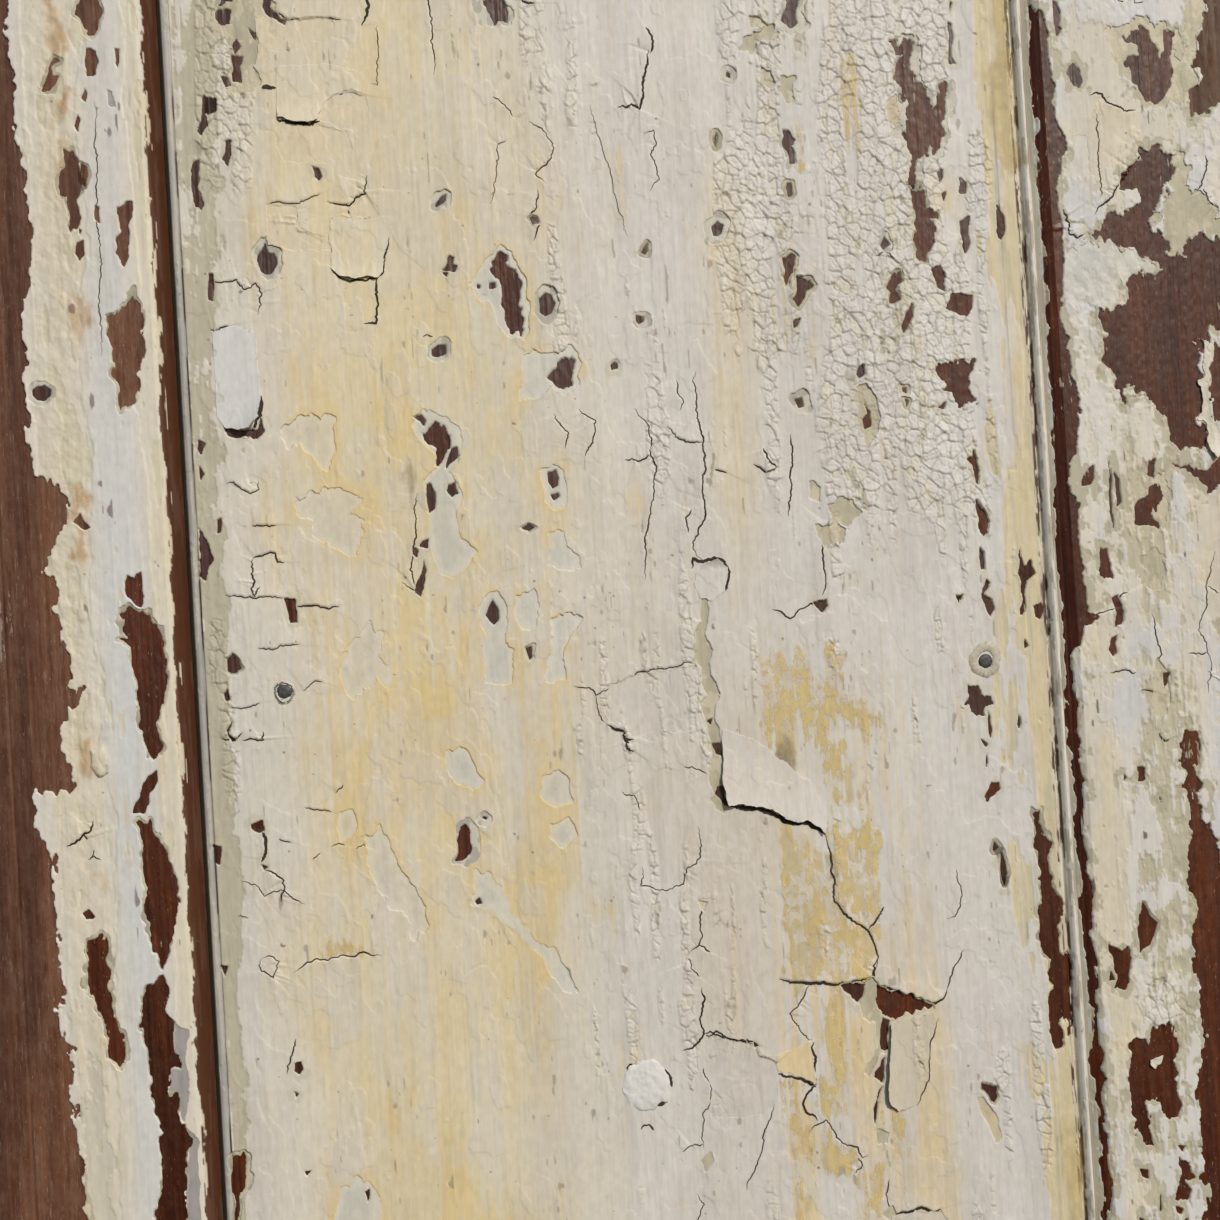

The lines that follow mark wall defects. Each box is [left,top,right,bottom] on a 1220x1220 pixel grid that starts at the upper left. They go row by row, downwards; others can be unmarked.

crack [590,28,660,232]
peeling [887,3,973,317]
peeling [469,245,582,401]
peeling [0,0,201,1220]
peeling [402,409,477,596]
crack [625,374,793,591]
peeling [1018,550,1043,619]
peeling [1028,0,1220,1220]
crack [640,830,702,891]
crack [683,911,758,1152]
crack [729,805,964,1184]
crack [886,1179,942,1220]